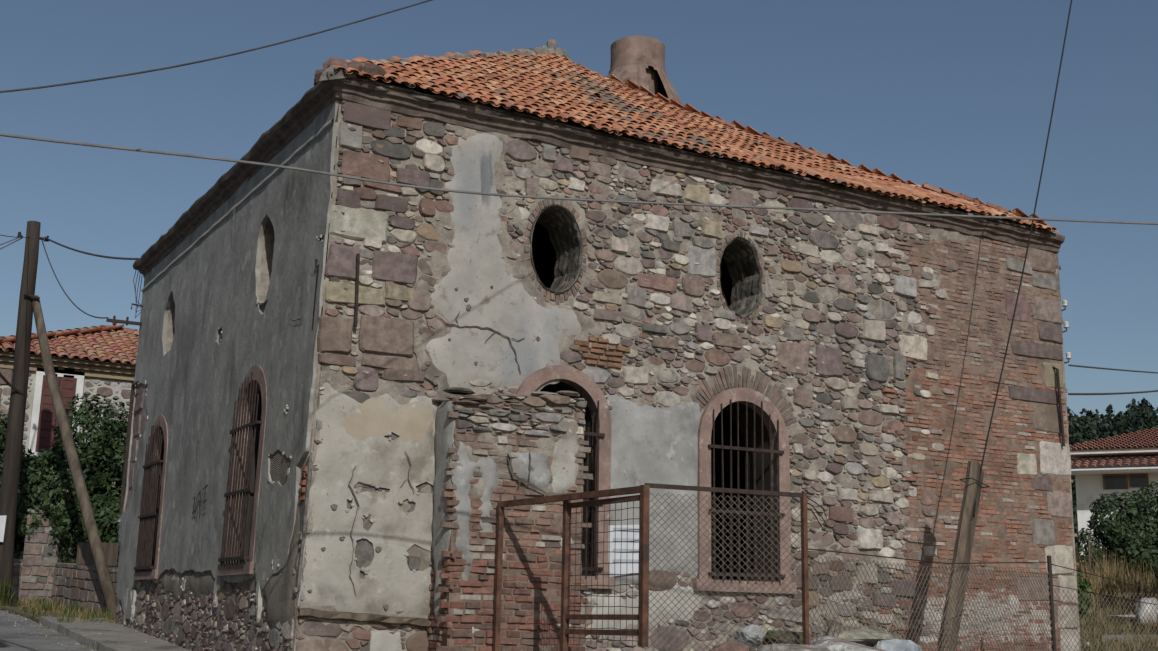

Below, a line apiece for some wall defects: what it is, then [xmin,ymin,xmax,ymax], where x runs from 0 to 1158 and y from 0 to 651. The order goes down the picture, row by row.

crack [435,311,524,375]
flaking render [267,450,313,595]
spalling [331,482,433,523]
spalling [339,536,382,579]
spalling [404,544,432,572]
flaking render [123,589,138,627]
flaking render [255,559,280,626]